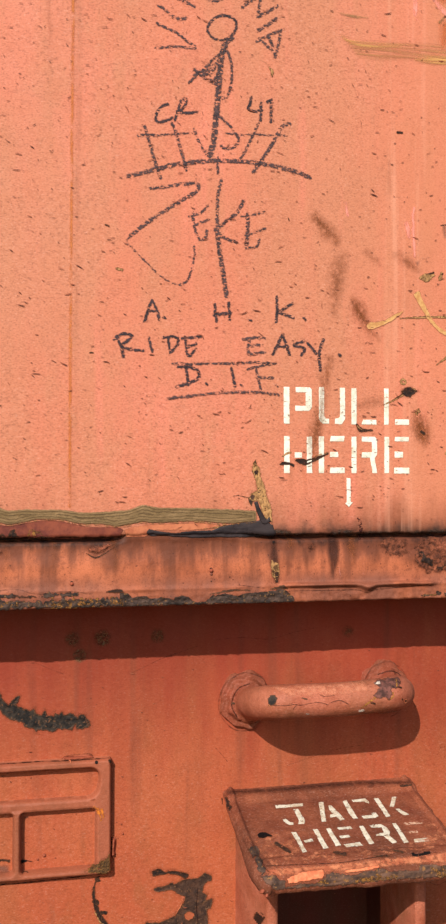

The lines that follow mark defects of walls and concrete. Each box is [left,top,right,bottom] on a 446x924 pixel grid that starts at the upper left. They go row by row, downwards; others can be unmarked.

peeling [419,272,443,282]
corrosion [0,585,294,611]
peeling [0,694,91,732]
peeling [359,677,408,712]
peeling [255,823,446,875]
peeling [144,868,212,924]